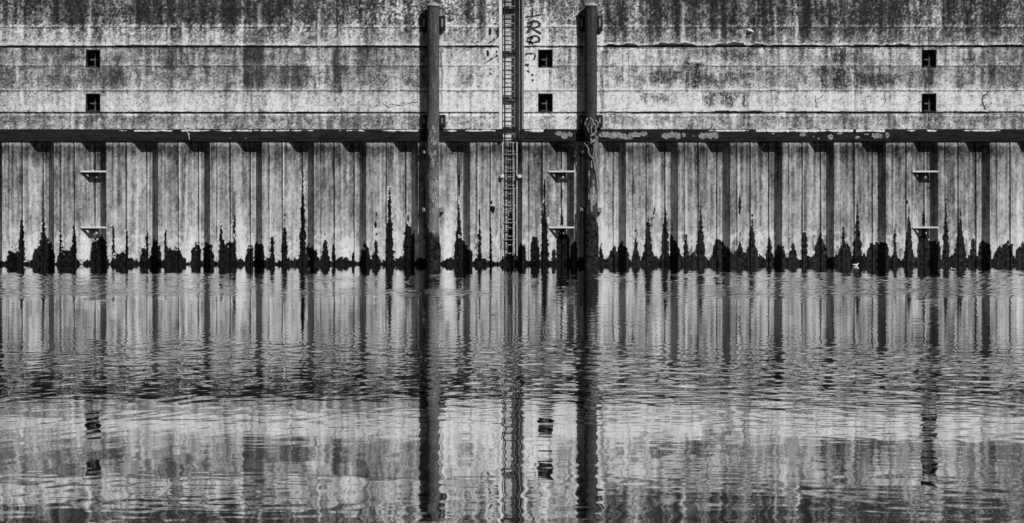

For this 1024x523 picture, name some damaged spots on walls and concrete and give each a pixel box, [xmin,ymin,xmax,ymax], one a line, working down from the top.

damp [644,2,752,107]
damp [814,48,899,89]
damp [78,232,89,259]
damp [109,234,125,253]
damp [337,239,360,260]
damp [442,211,452,260]